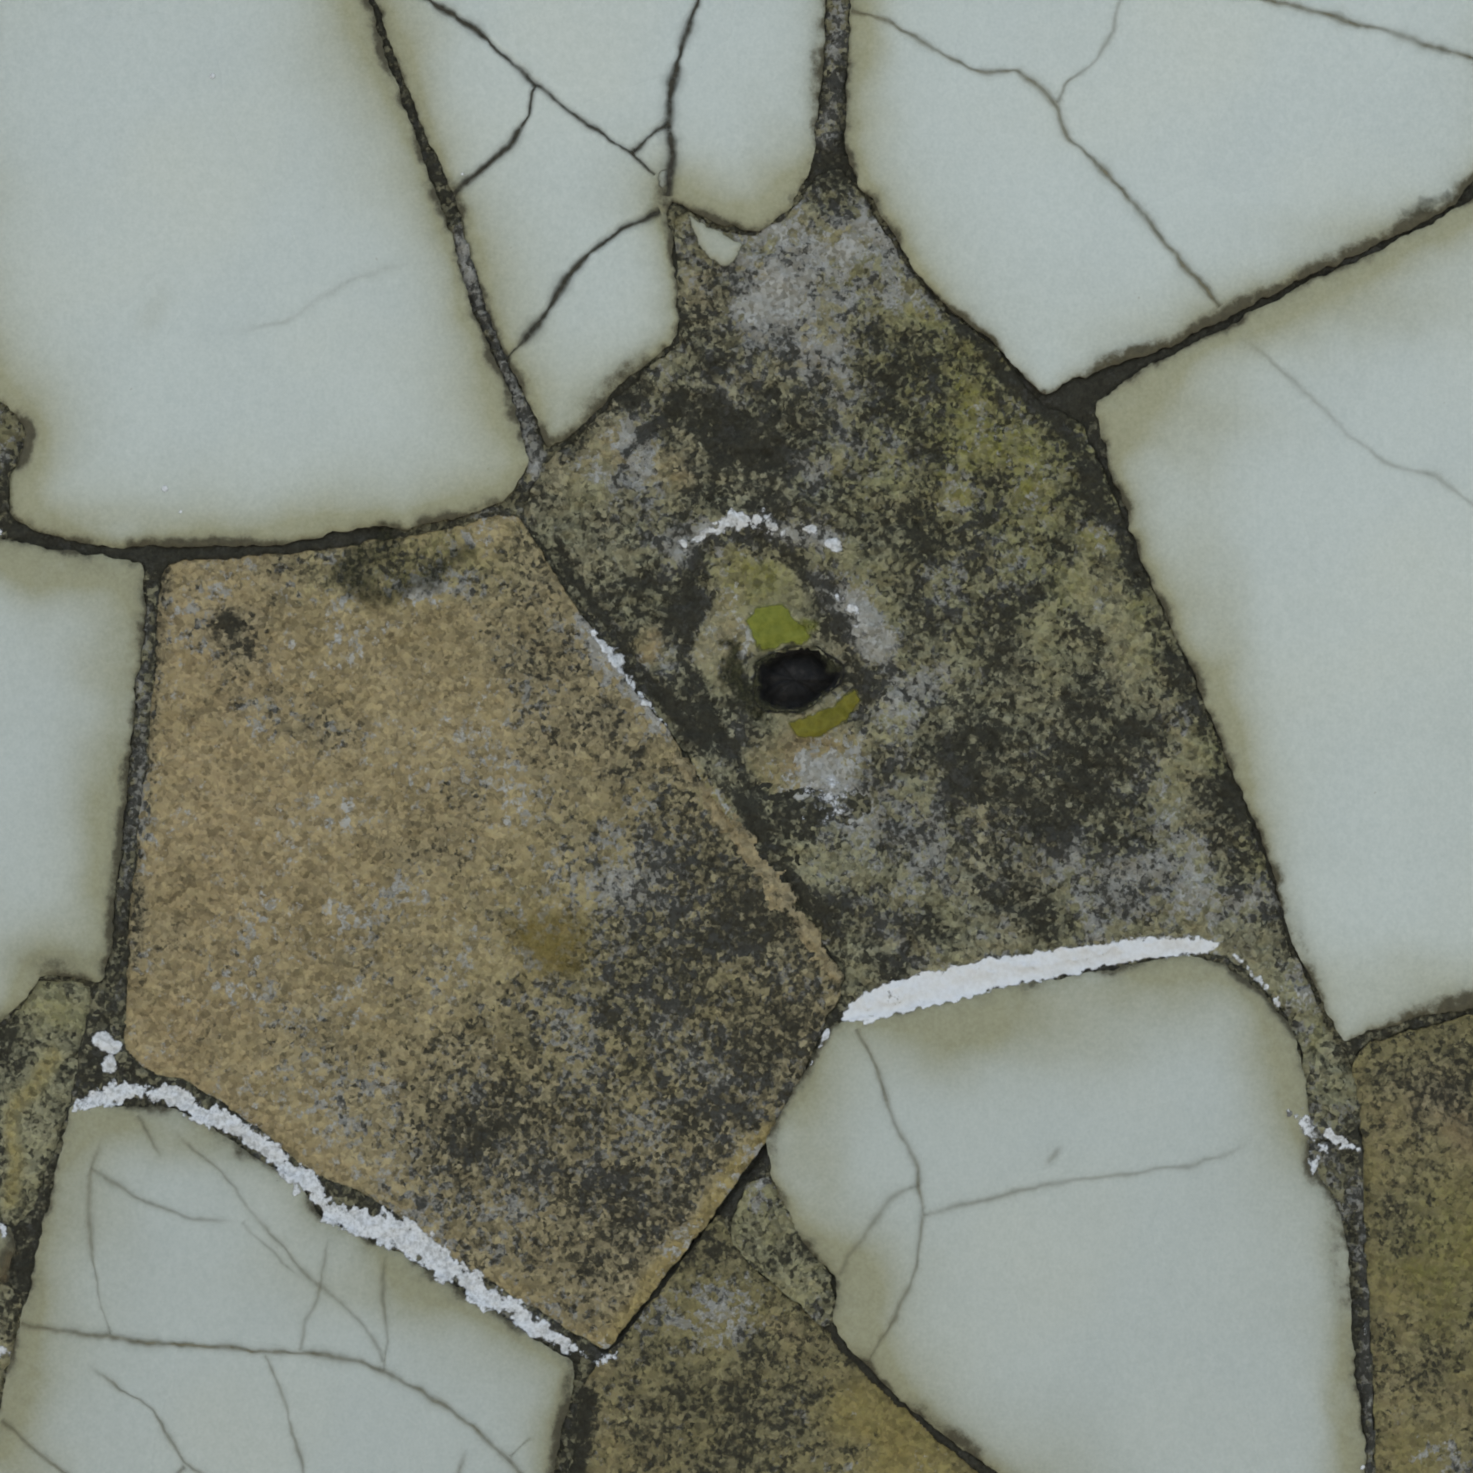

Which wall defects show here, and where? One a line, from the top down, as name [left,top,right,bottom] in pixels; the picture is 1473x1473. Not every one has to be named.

crack [1263,0,1376,28]
crack [427,0,700,360]
peeling [688,214,742,267]
crack [851,9,1221,308]
efflorescence [678,508,842,552]
water stain [835,593,867,636]
efflorescence [811,935,1281,1065]
spalling [0,979,90,1227]
water stain [72,1031,617,1367]
spalling [731,1177,835,1326]
spalling [0,1284,22,1398]
crack [74,1331,482,1435]